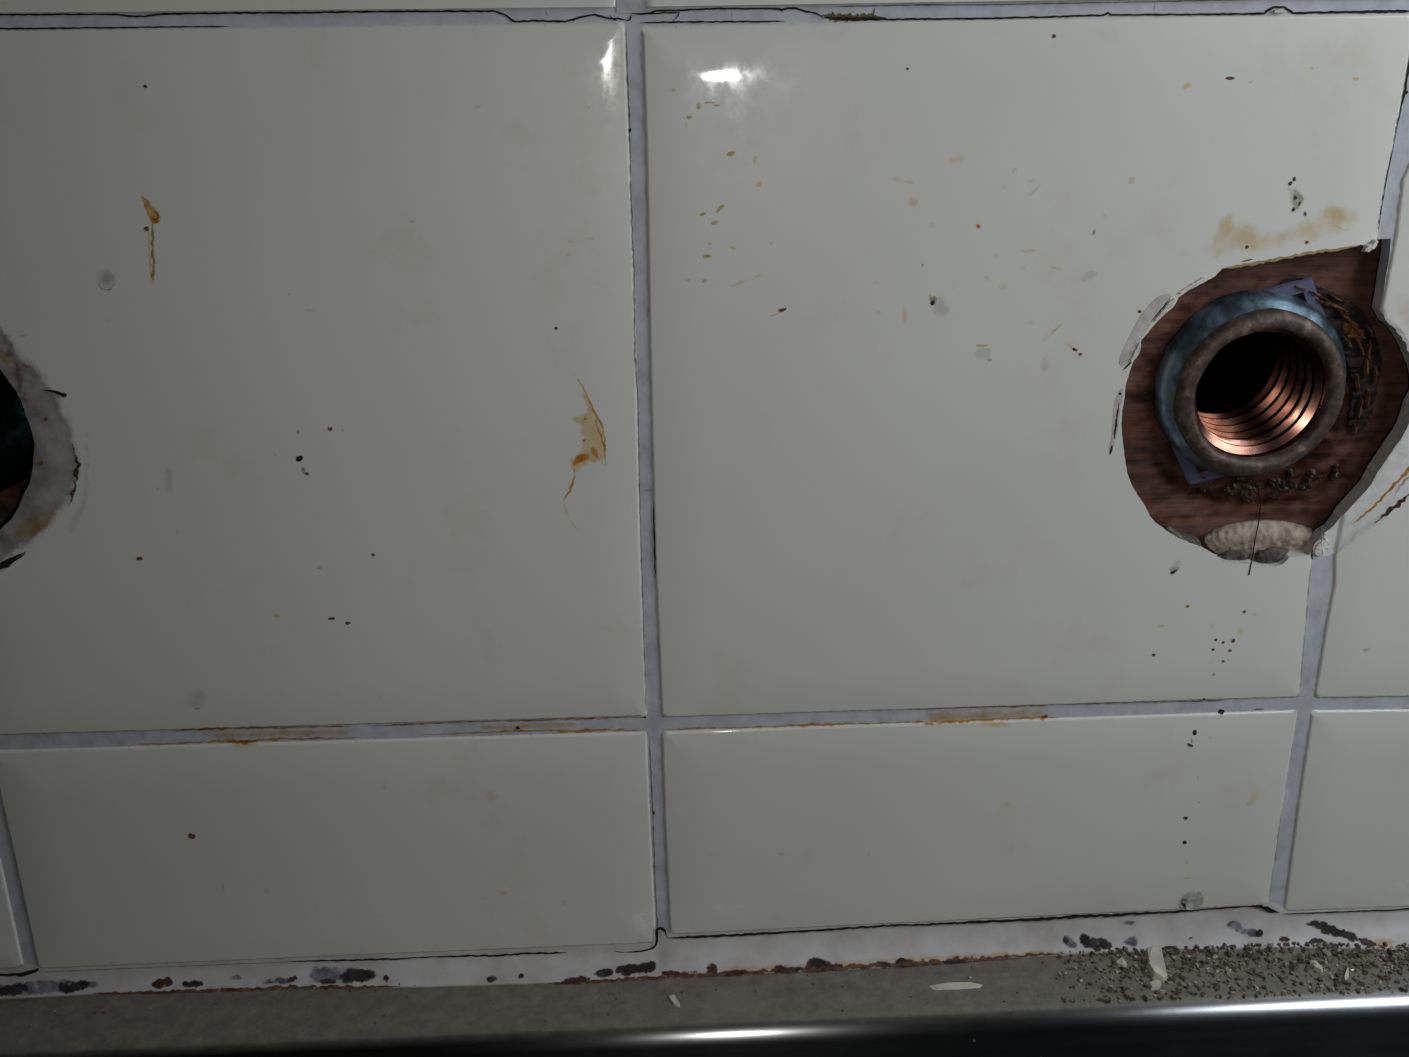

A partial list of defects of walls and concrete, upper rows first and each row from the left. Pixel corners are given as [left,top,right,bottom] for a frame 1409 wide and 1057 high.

peeling [1357,239,1378,252]
spalling [1119,277,1209,370]
spalling [1282,277,1409,435]
spalling [1110,388,1123,455]
spalling [1164,424,1409,564]
damp [1063,933,1136,950]
damp [1307,920,1376,947]
damp [59,980,90,994]
damp [152,977,203,989]
damp [318,969,389,984]
damp [562,961,747,984]
damp [774,957,843,974]